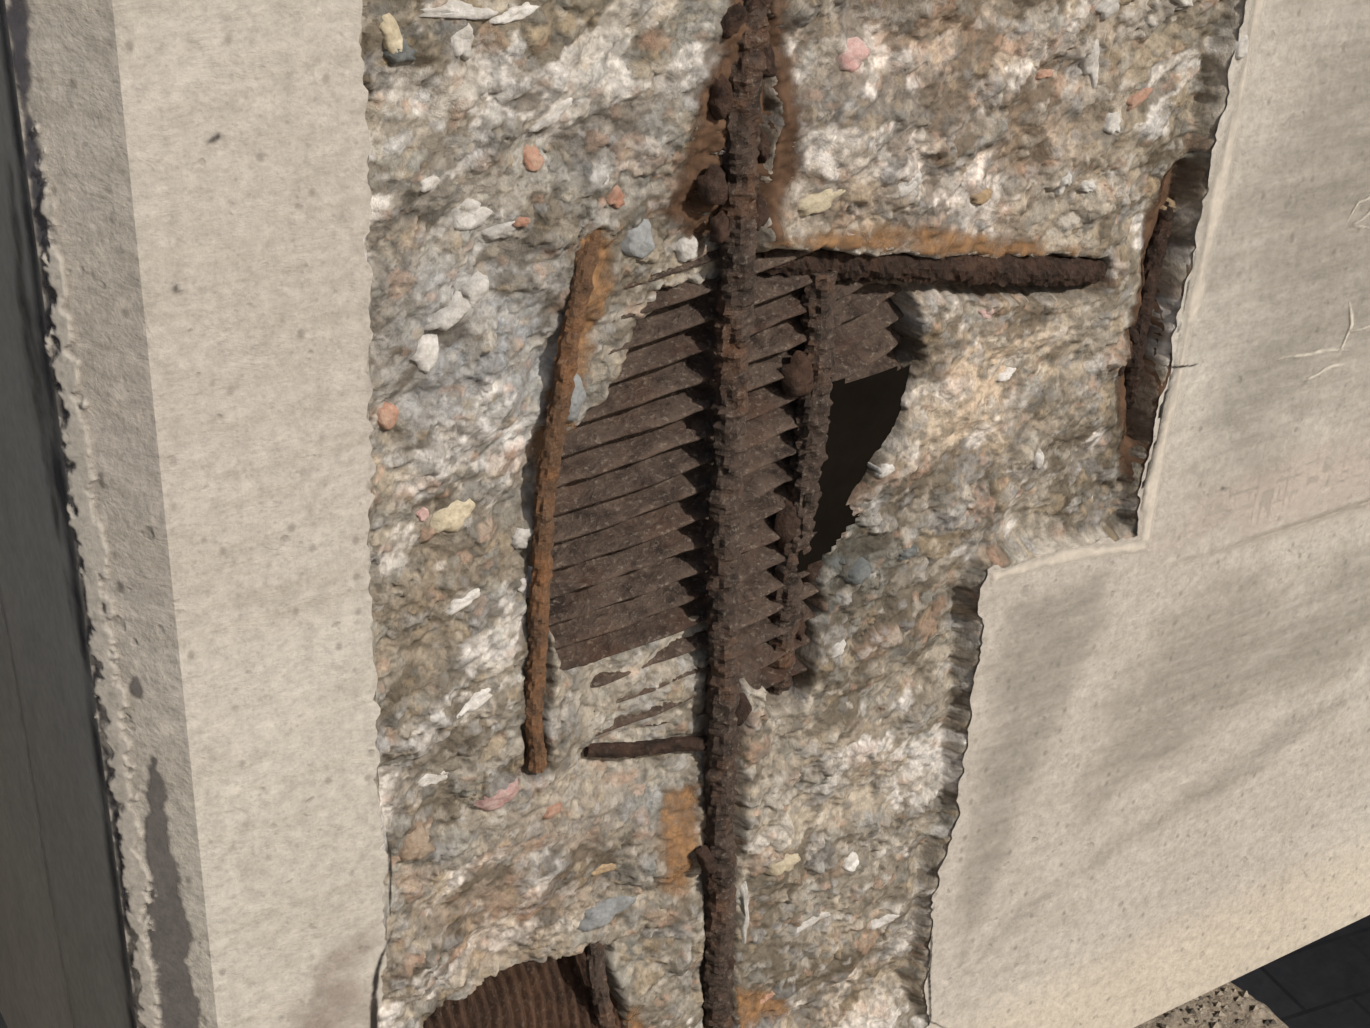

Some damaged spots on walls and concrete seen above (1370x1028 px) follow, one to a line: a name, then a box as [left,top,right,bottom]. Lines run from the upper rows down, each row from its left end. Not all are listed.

water stain [0,0,69,423]
corrosion [528,373,555,458]
corrosion [577,234,612,377]
corrosion [662,0,749,241]
spalling [359,0,1249,1028]
corrosion [757,0,1077,258]
corrosion [1118,162,1179,504]
water stain [50,443,134,989]
spalling [131,678,143,698]
corrosion [662,786,698,895]
corrosion [734,987,788,1028]